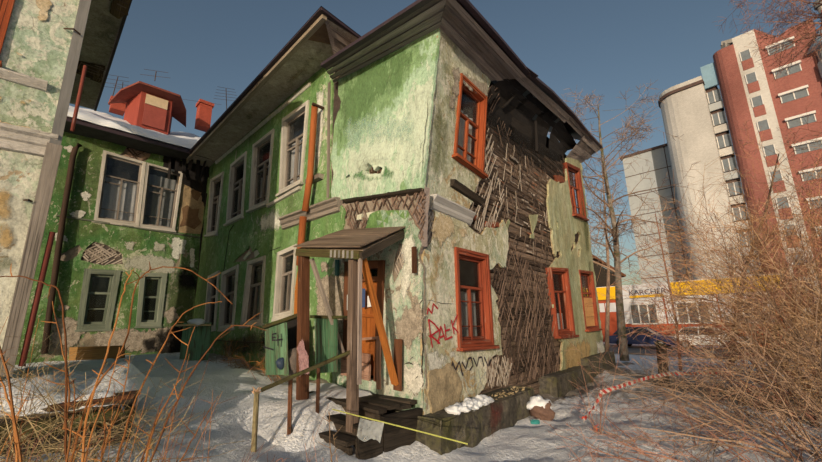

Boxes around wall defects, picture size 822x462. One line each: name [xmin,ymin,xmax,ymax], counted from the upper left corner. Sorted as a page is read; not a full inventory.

flaking render [109,0,130,19]
flaking render [177,177,204,234]
flaking render [343,186,435,255]
peeling [53,233,175,273]
flaking render [394,244,405,281]
flaking render [469,109,564,395]
peeling [393,295,426,349]
spalling [402,350,462,414]